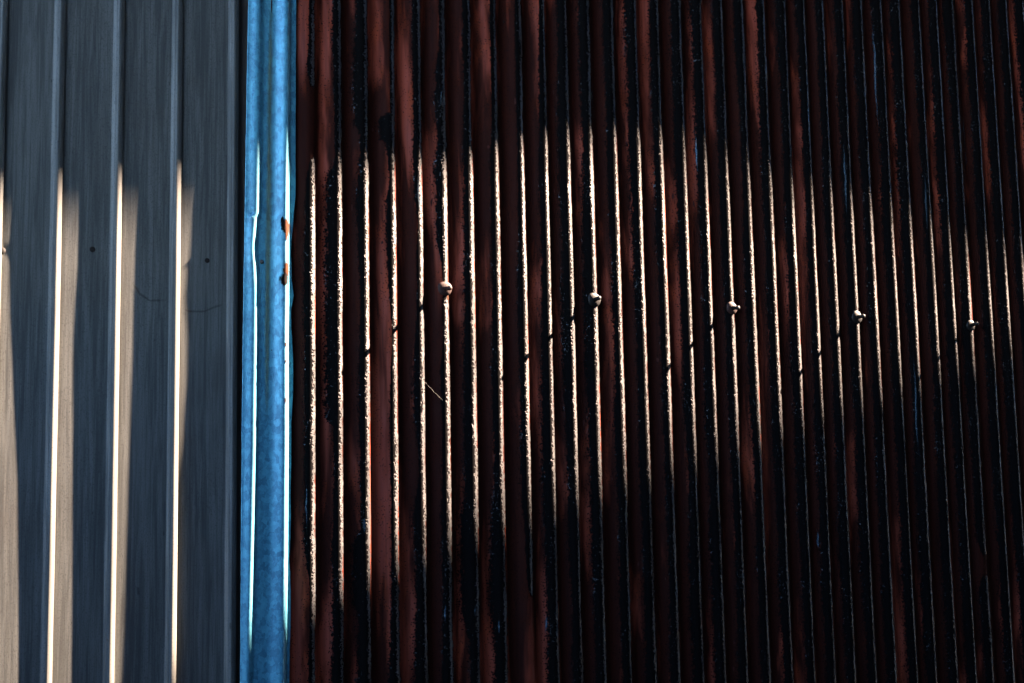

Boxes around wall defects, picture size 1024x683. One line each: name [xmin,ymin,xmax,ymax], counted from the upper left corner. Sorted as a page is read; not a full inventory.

corrosion [281,217,290,240]